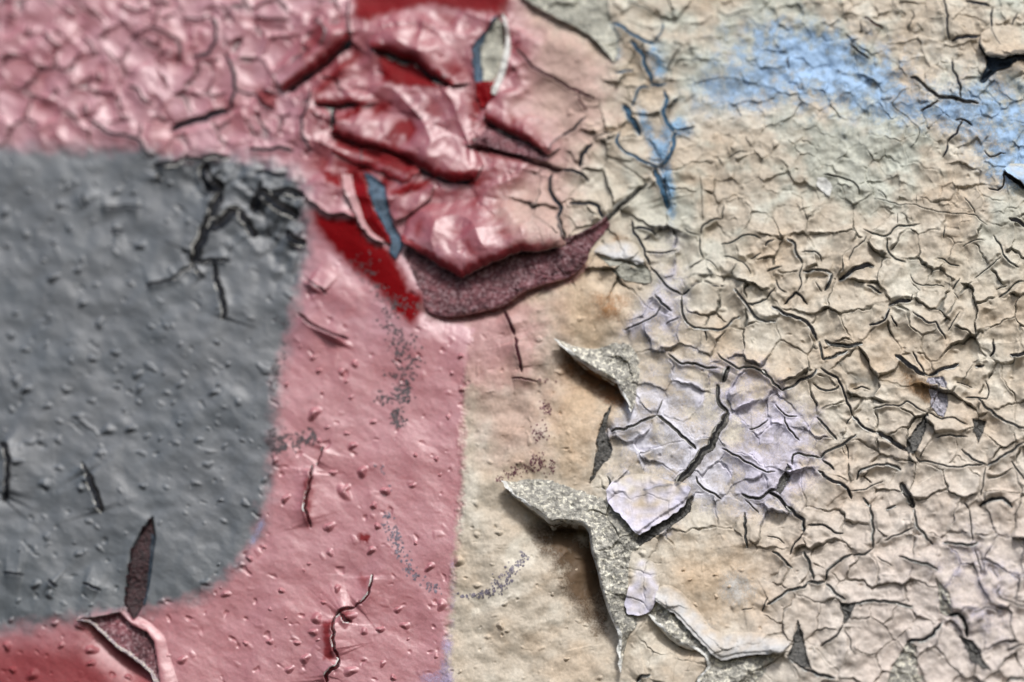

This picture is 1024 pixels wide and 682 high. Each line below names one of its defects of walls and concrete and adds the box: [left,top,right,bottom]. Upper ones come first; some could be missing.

peeling [369,26,472,86]
peeling [528,0,619,62]
peeling [979,24,1024,82]
crack [6,1,470,320]
peeling [300,88,652,318]
crack [298,313,347,339]
peeling [554,338,640,412]
crack [473,0,1024,680]
crack [302,446,324,527]
peeling [502,406,811,682]
peeling [76,518,178,682]
crack [324,574,373,682]